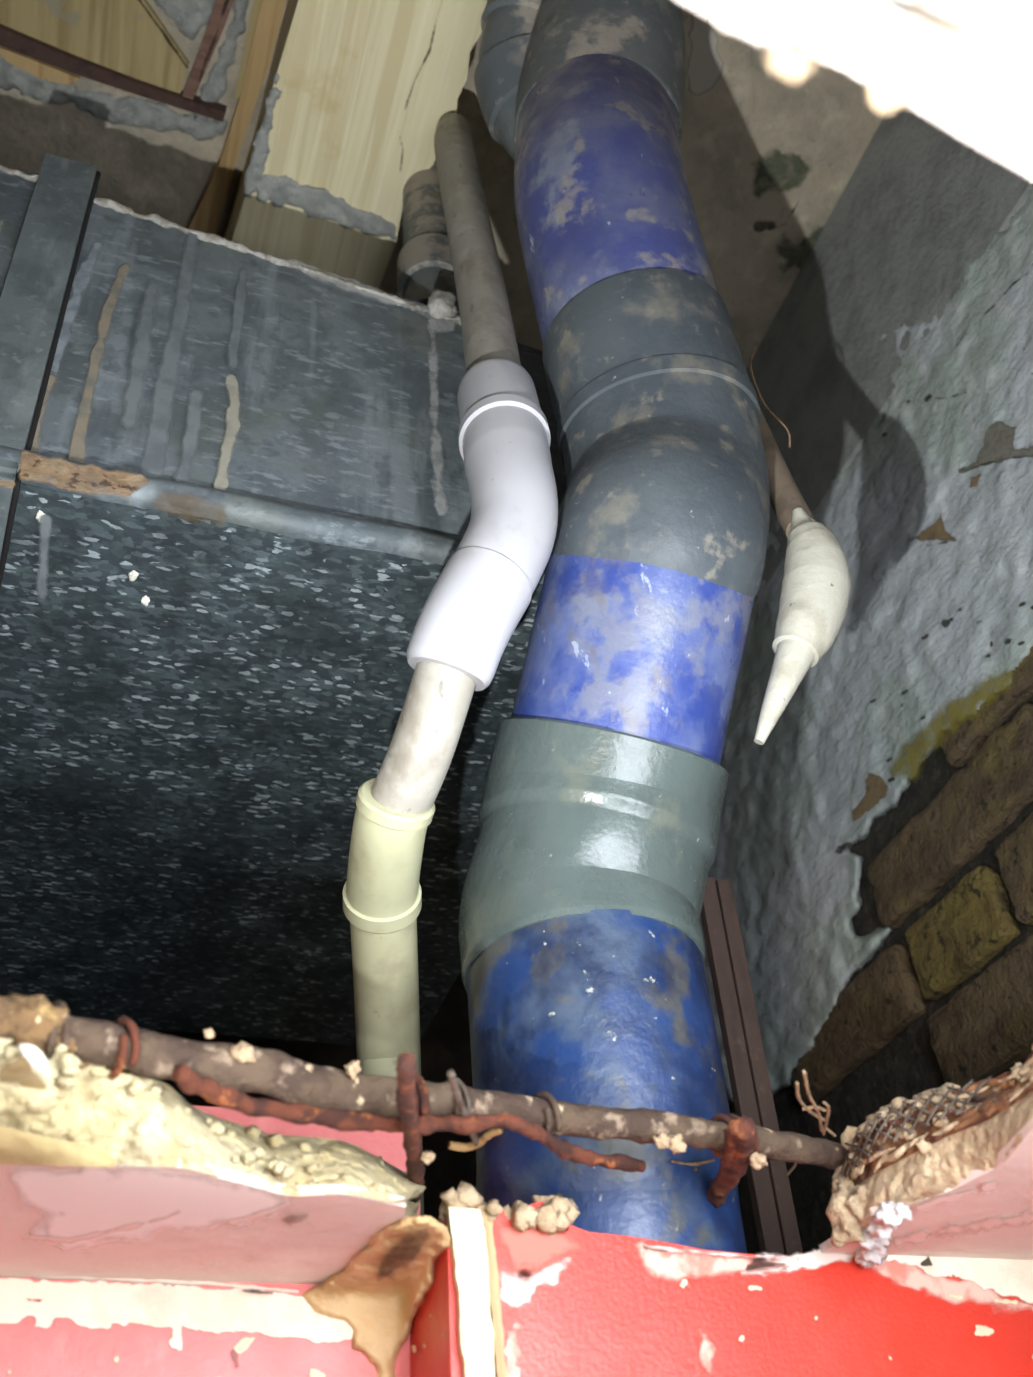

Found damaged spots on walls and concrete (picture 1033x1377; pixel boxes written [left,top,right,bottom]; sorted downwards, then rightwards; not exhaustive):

crack [406,31,434,106]
damp [31,242,102,452]
damp [68,264,129,464]
damp [122,232,202,483]
damp [214,269,247,490]
corrosion [0,451,149,497]
peeling [959,421,1033,488]
damp [891,671,1013,779]
flaking render [638,638,1033,1291]
damp [378,1231,429,1279]
peeling [0,1277,353,1354]